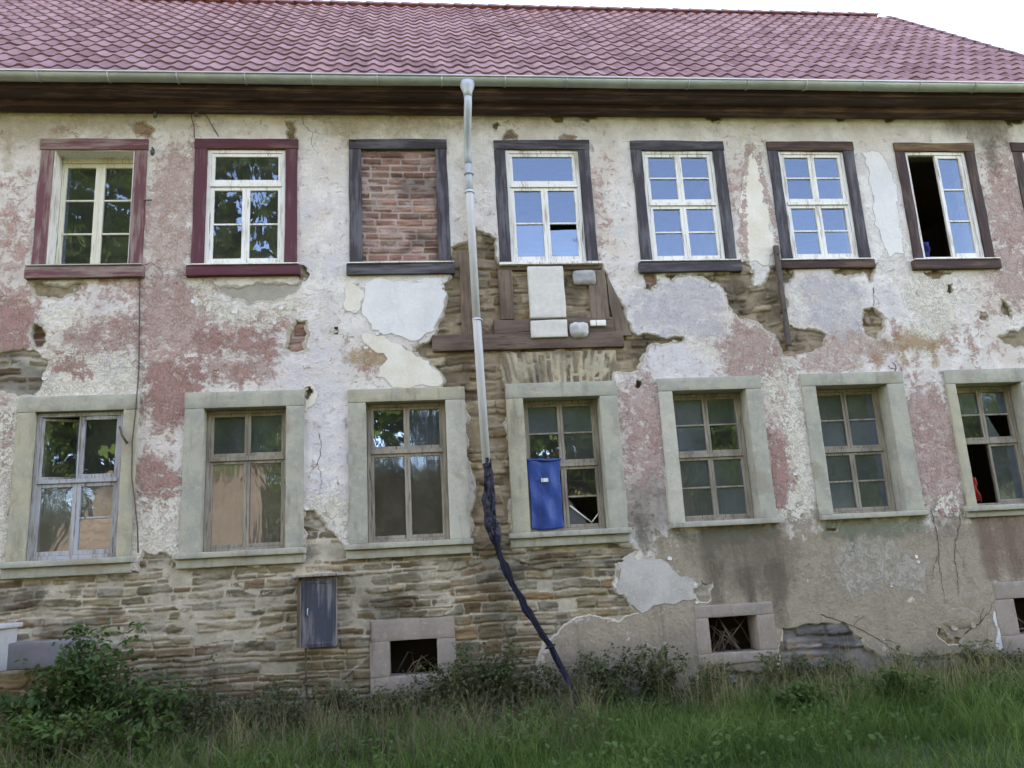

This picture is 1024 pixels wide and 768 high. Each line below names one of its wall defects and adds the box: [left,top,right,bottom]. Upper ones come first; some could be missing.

peeling [830,150,905,284]
spalling [0,142,310,554]
spalling [643,135,839,532]
spalling [861,307,888,342]
spalling [0,226,685,740]
spalling [693,578,714,604]
crack [819,614,898,648]
leakage [833,532,926,599]
crack [931,510,966,599]
efflorescence [993,612,1003,650]